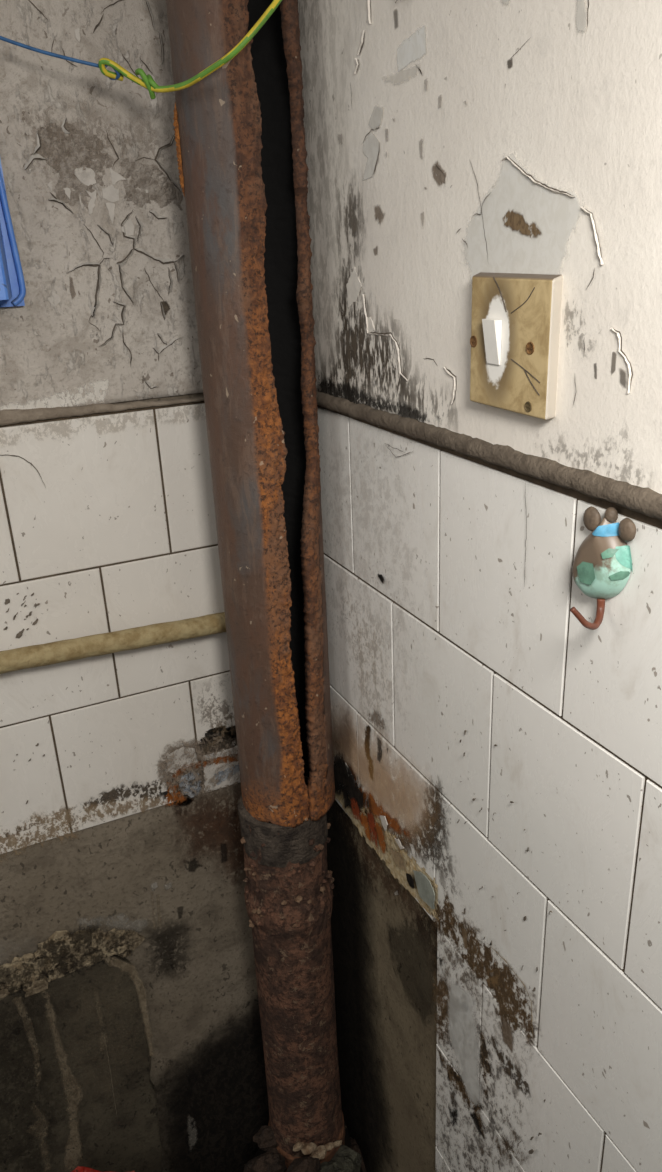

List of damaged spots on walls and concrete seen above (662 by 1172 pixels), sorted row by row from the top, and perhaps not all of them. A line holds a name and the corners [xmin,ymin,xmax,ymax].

crack [106,131,183,193]
rust [173,102,185,197]
flaking render [425,161,446,189]
peeling [503,210,541,238]
crack [67,210,184,389]
mould [317,195,439,423]
peeling [167,746,240,798]
rust [181,800,245,870]
rust [345,762,409,836]
spalling [0,925,154,1056]
water stain [434,895,538,1051]
water stain [432,956,525,1164]